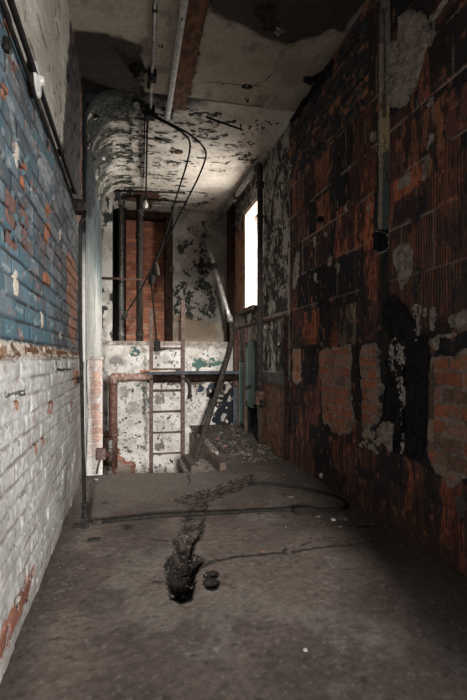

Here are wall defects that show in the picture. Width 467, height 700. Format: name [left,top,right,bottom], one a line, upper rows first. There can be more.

peeling [3,138,54,253]
peeling [43,203,61,247]
peeling [86,92,301,385]
spalling [0,252,79,363]
peeling [112,349,233,474]
flaking render [318,337,406,456]
flaking render [426,348,467,489]
crack [152,474,373,605]
spalling [0,565,35,664]